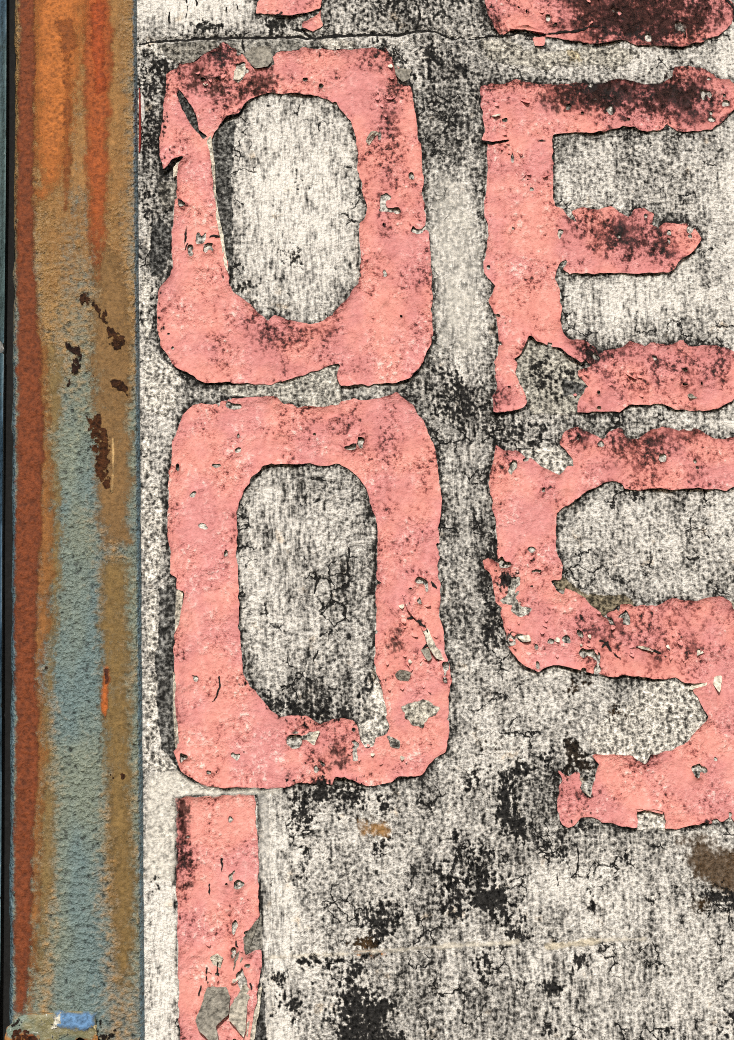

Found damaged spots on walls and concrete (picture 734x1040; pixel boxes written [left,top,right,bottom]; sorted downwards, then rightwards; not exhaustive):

peeling [177,91,235,280]
peeling [139,158,183,416]
peeling [216,364,342,407]
peeling [515,338,588,415]
rust [9,0,137,1040]
peeling [584,675,722,764]
damp [454,732,597,851]
damp [549,806,593,862]
damp [676,833,734,913]
peeling [195,915,267,1040]
damp [264,829,534,1040]
damp [511,936,659,1009]